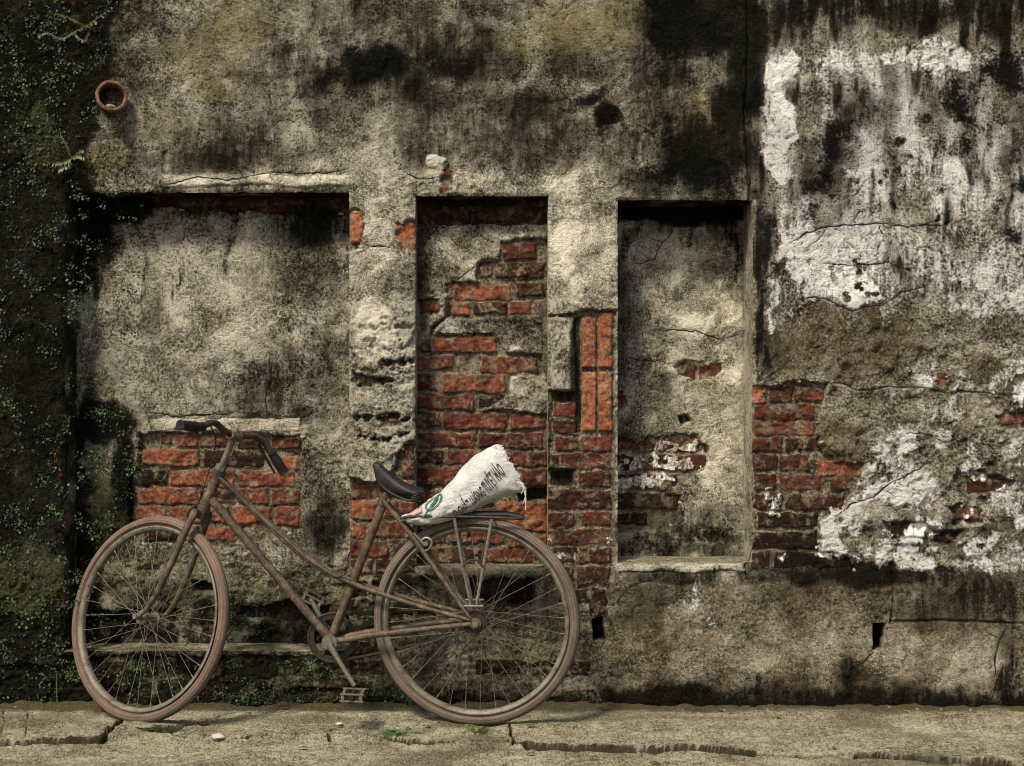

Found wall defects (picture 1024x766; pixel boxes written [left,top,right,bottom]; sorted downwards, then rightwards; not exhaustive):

damp [318,42,495,95]
damp [577,87,623,143]
crack [163,169,345,186]
damp [617,0,1024,393]
crack [793,210,947,332]
spalling [674,357,723,382]
crack [830,382,1016,404]
spalling [349,236,710,609]
spalling [743,340,1024,576]
spalling [127,431,305,549]
crack [986,627,1008,681]
damp [603,663,970,707]